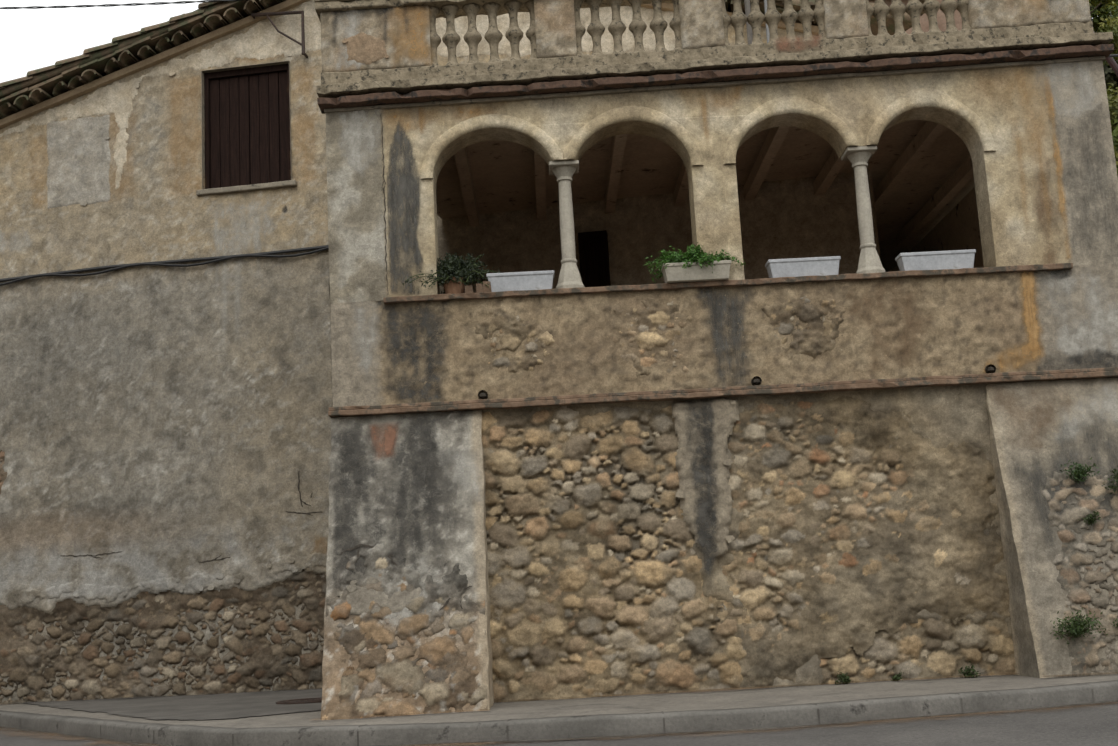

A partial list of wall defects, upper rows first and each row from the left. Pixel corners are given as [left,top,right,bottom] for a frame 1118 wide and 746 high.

peeling [0,0,321,190]
water stain [342,110,375,170]
peeling [342,32,389,65]
peeling [435,12,531,58]
peeling [580,6,675,54]
water stain [359,124,446,402]
crack [285,472,318,516]
water stain [334,416,478,581]
spalling [0,396,1016,720]
water stain [688,401,717,575]